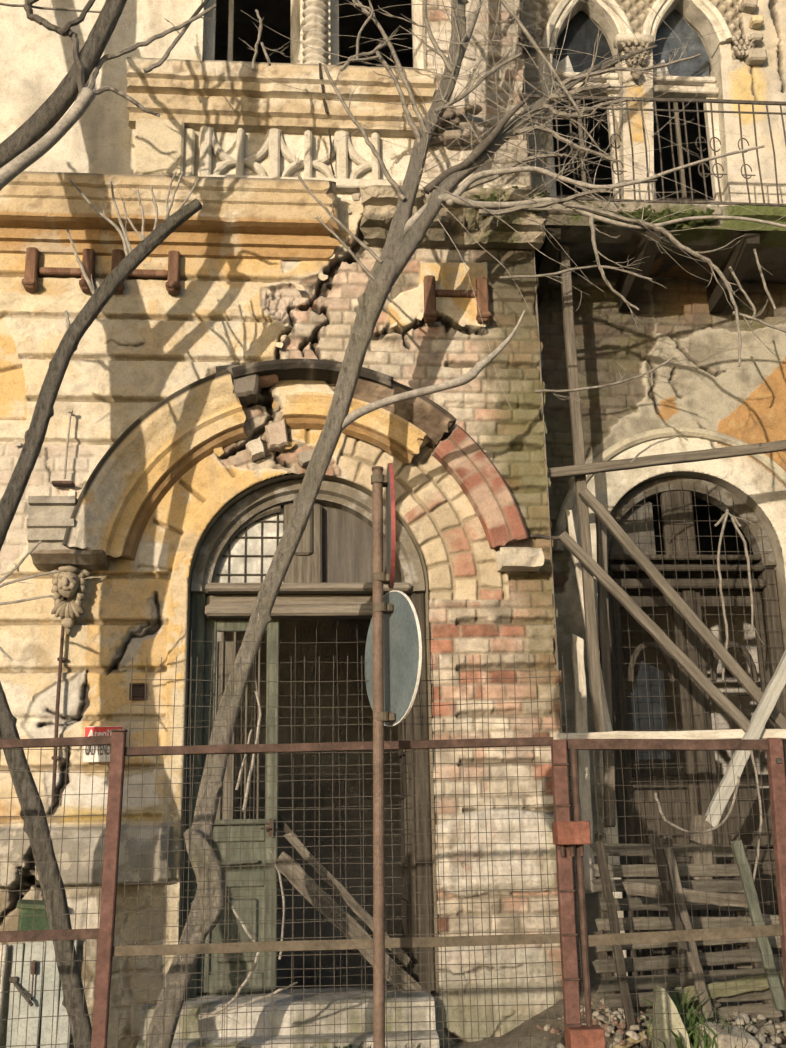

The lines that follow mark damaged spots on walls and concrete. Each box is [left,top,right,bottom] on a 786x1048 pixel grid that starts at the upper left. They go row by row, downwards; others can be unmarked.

flaking render [102,232,384,362]
crack [371,312,489,349]
flaking render [214,384,315,474]
flaking render [624,368,647,416]
peeling [656,394,680,421]
flaking render [0,439,96,574]
flaking render [325,246,572,1046]
flaking render [0,668,90,739]
crack [39,591,163,815]
crack [0,847,41,925]